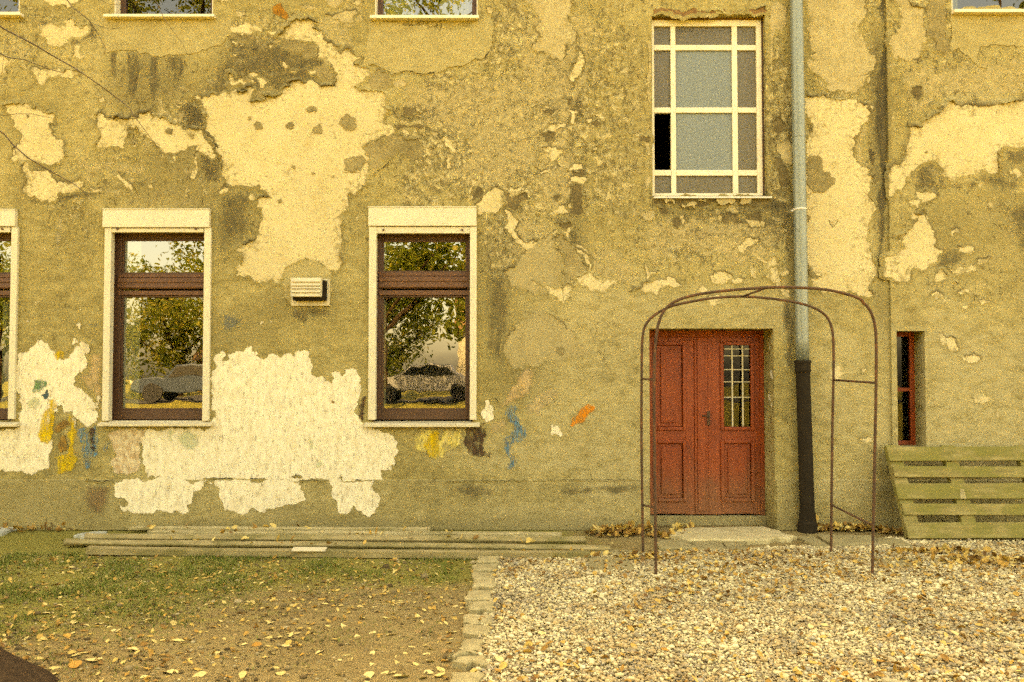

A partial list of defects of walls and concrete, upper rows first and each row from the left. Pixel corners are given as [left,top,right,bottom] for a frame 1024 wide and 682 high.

leakage [111,53,183,95]
flaking render [0,0,794,374]
flaking render [803,0,1024,312]